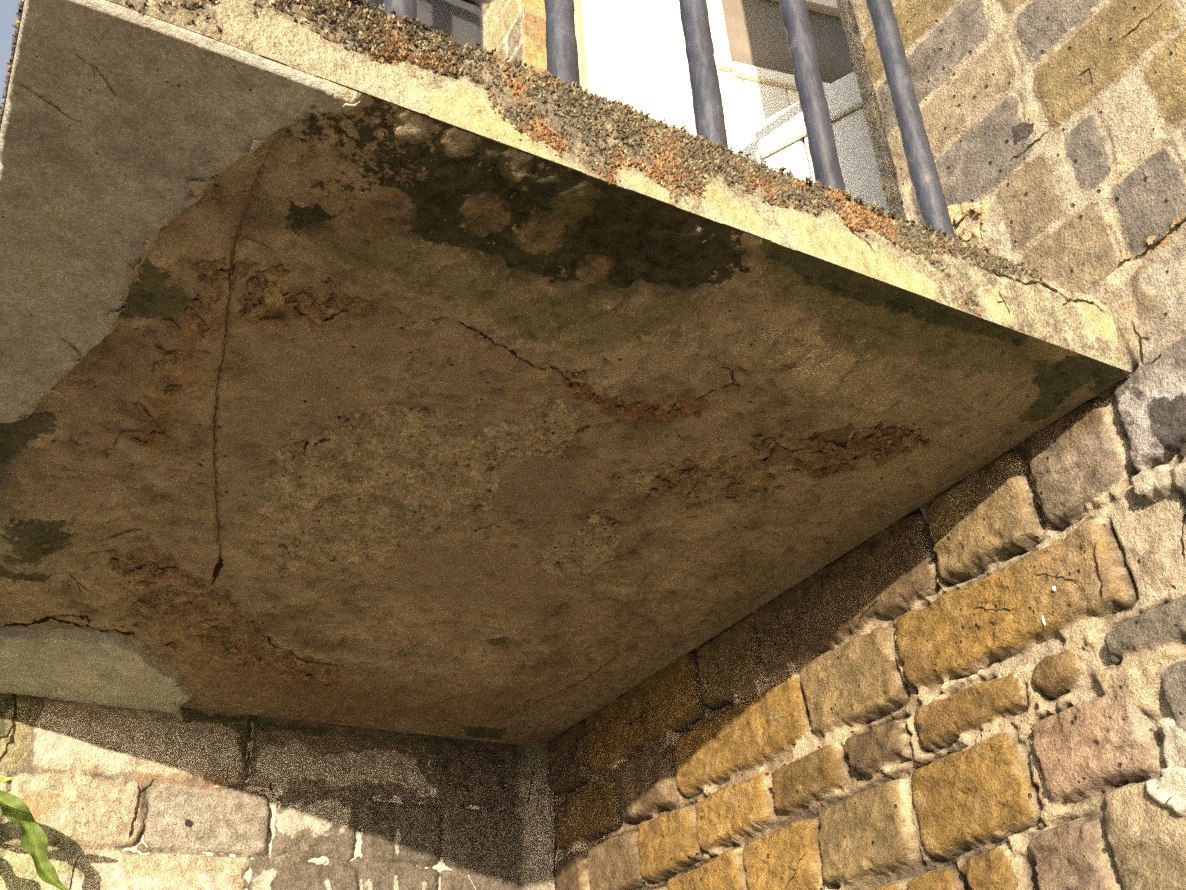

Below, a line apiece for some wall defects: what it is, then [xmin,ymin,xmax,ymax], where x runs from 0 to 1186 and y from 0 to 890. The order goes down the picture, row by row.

damp [202,0,786,301]
peeling [0,0,330,423]
spalling [947,200,990,249]
crack [1130,217,1186,261]
crack [952,212,1162,364]
crack [213,138,276,568]
crack [407,317,563,376]
damp [0,407,65,484]
spalling [649,421,930,514]
peeling [0,545,341,714]
damp [358,879,375,890]
damp [391,875,401,890]